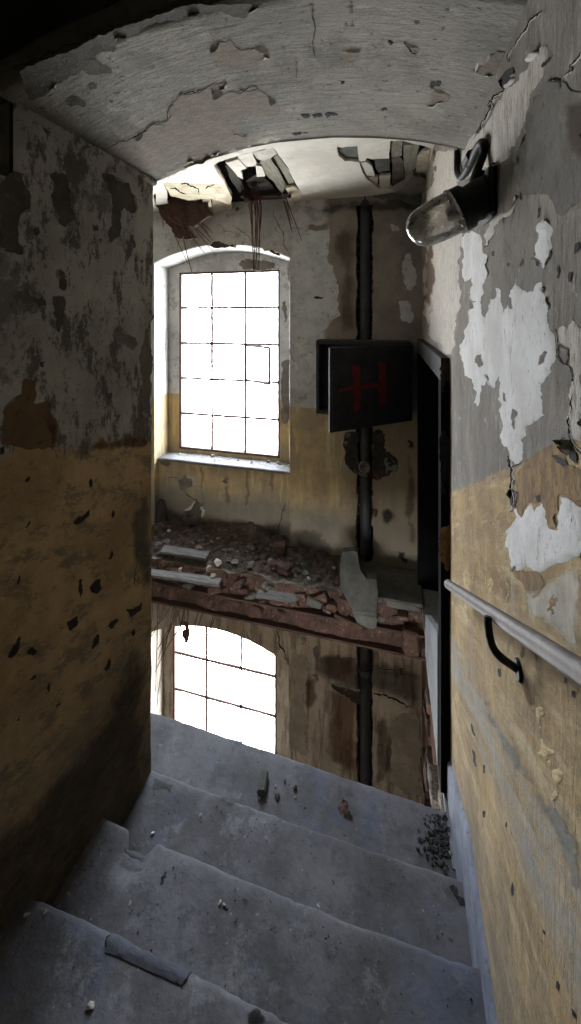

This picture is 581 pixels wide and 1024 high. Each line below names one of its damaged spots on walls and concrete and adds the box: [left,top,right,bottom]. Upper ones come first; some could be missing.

peeling [0,171,31,256]
peeling [50,173,75,227]
peeling [93,173,143,263]
peeling [33,268,67,332]
peeling [114,315,154,418]
peeling [398,46,581,614]
peeling [0,379,58,455]
spalling [343,429,398,481]
crack [507,455,521,509]
water stain [306,681,316,707]
water stain [320,658,416,768]